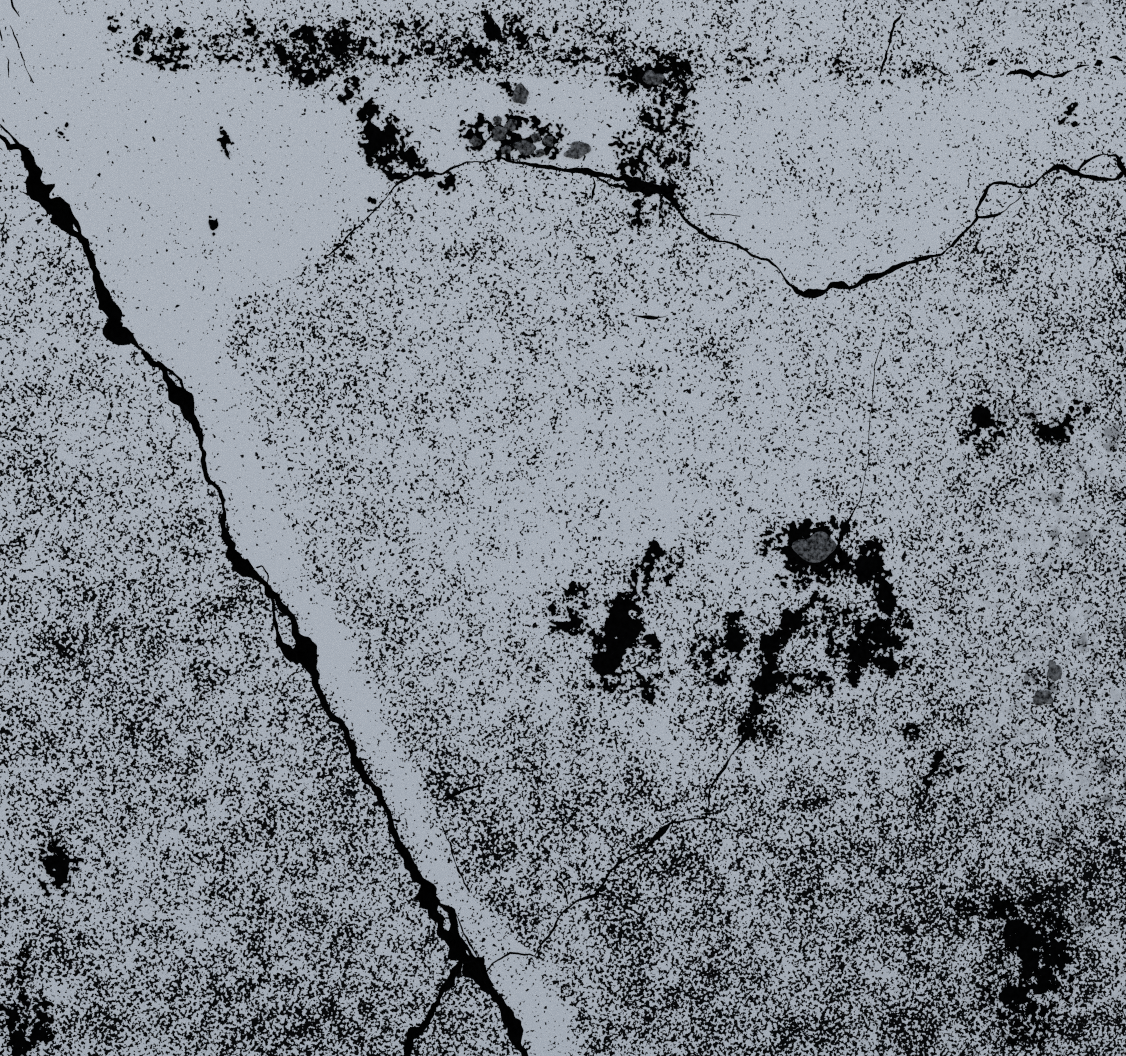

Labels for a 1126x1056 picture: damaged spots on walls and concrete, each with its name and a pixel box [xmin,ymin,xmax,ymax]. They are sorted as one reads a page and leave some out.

crack [0,0,34,83]
crack [878,12,903,77]
crack [326,153,1126,298]
crack [838,345,882,544]
crack [0,124,750,1056]